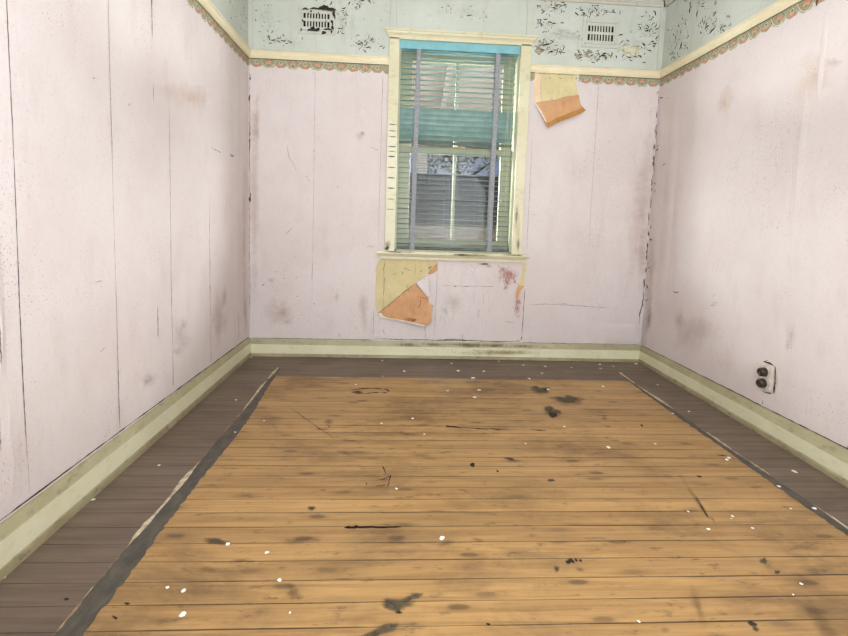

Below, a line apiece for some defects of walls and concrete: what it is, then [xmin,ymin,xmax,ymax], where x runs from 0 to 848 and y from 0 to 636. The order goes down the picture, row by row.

peeling [229,0,384,53]
crack [0,245,27,444]